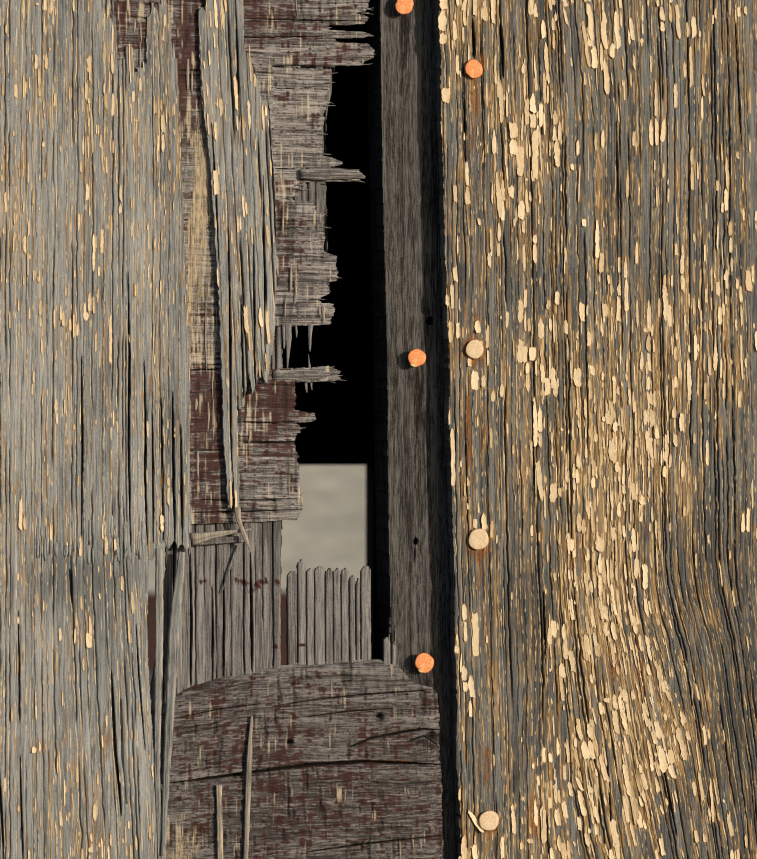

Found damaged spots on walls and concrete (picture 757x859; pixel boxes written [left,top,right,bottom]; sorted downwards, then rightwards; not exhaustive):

peeling [203,0,227,69]
peeling [75,7,141,276]
peeling [54,287,99,340]
peeling [237,305,270,378]
peeling [445,266,460,310]
peeling [448,0,757,859]
peeling [98,516,134,643]
peeling [74,596,92,648]
crack [175,690,425,719]
crack [111,671,122,816]
crack [174,728,438,783]
peeling [52,752,137,859]